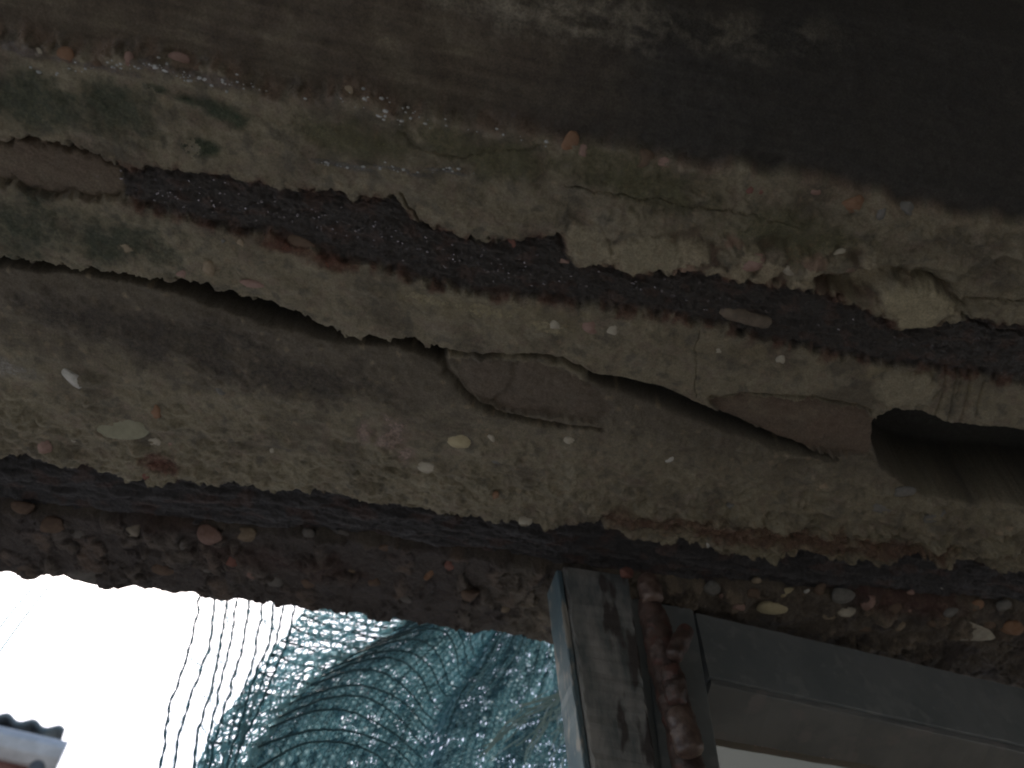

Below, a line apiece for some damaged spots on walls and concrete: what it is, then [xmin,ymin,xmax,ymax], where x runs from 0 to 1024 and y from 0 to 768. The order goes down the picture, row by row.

crack [0,255,839,463]
spalling [870,408,1024,503]
spalling [0,453,1024,689]